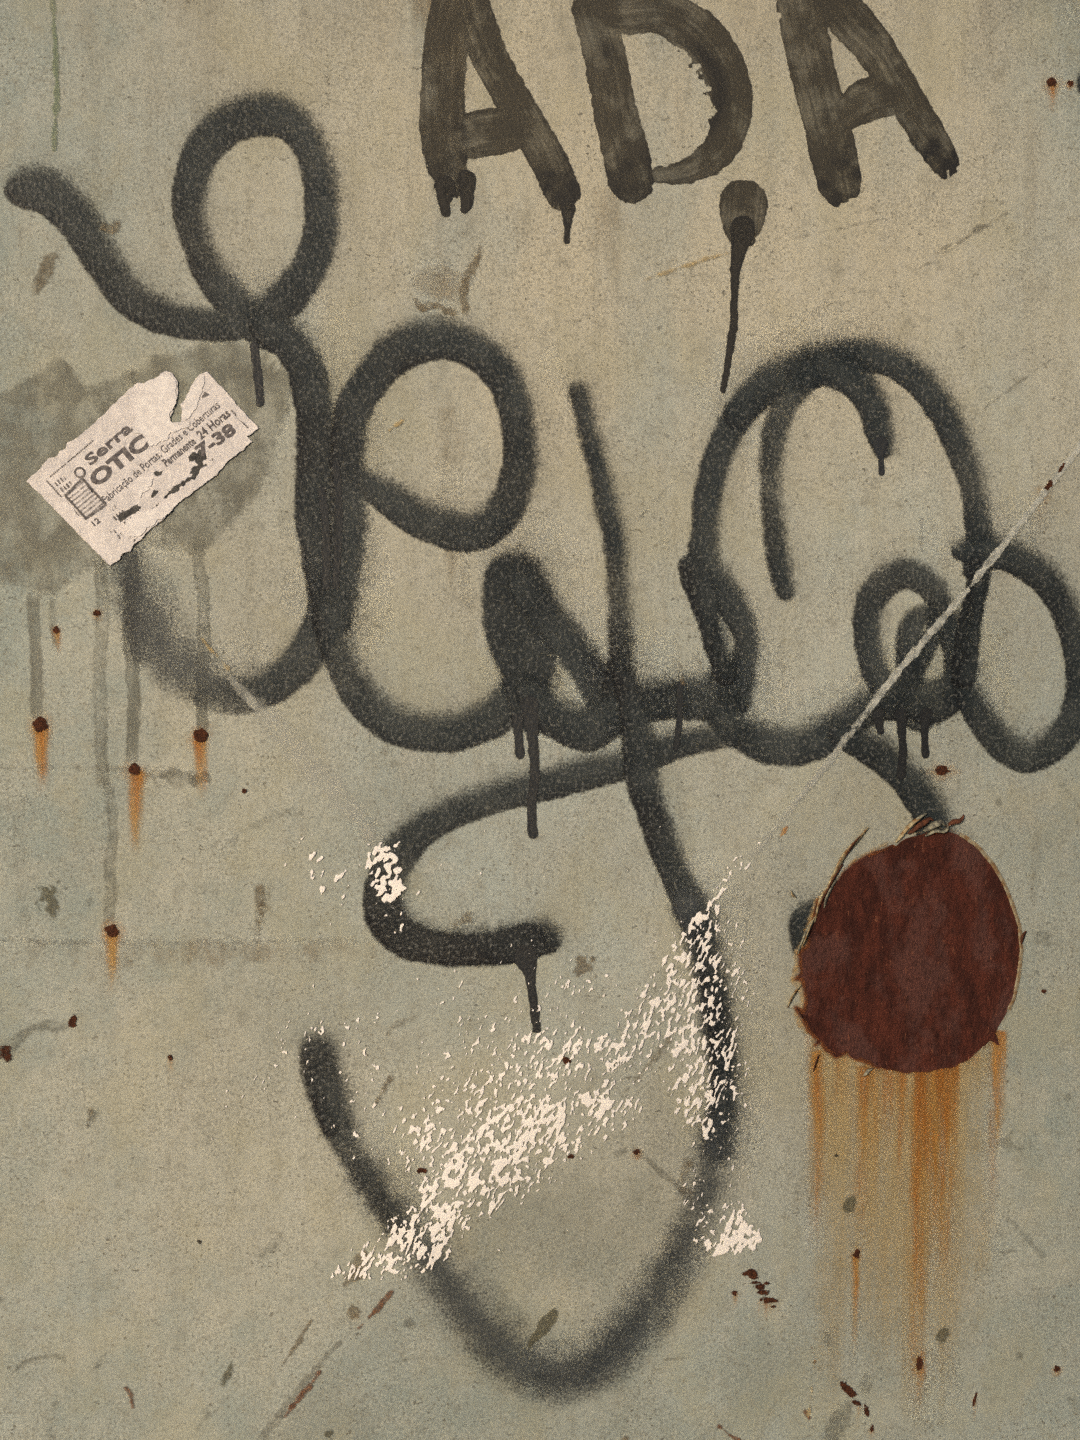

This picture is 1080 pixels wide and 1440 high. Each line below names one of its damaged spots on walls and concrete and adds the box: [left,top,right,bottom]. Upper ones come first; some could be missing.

corrosion [32,717,48,774]
corrosion [193,728,208,774]
corrosion [128,763,143,835]
corrosion [104,924,119,970]
corrosion [787,813,1027,1335]